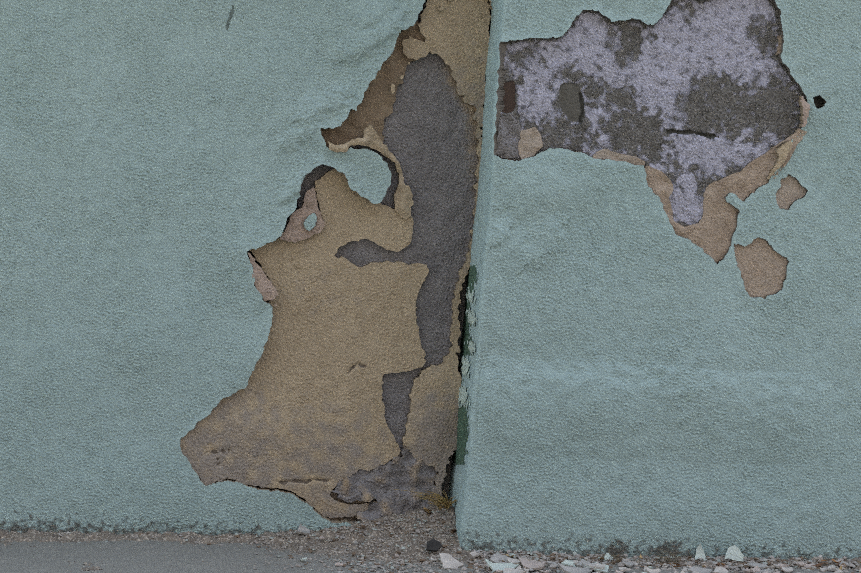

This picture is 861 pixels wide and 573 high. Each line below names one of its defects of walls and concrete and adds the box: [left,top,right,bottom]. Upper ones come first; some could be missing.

spalling [180,0,491,521]
spalling [496,0,823,299]